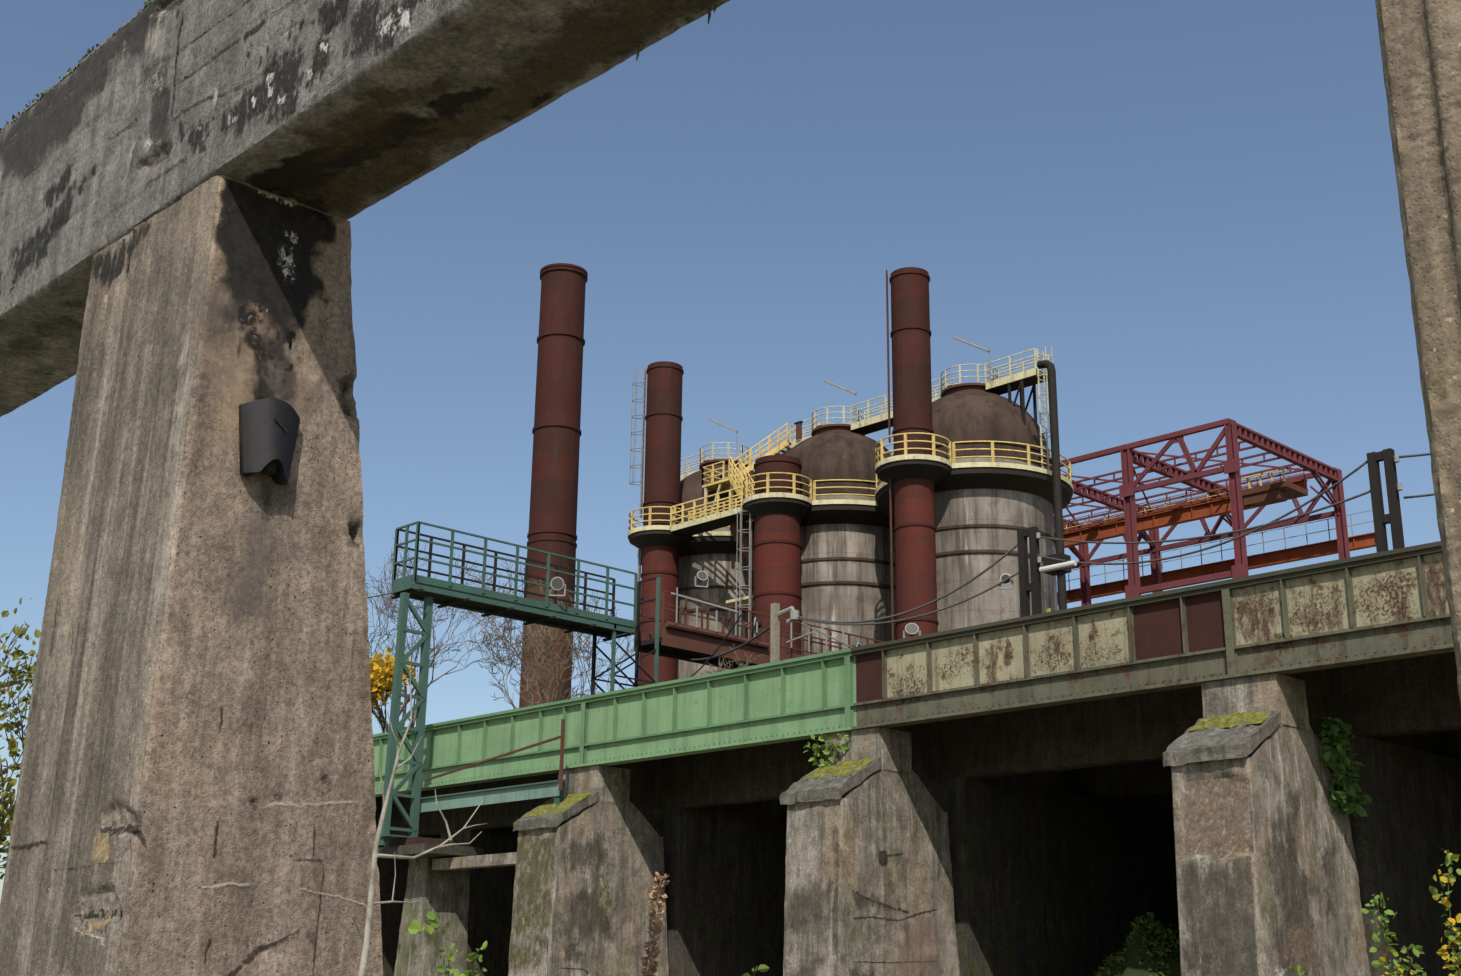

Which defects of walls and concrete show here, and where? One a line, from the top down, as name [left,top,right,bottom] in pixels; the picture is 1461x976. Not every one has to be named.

leakage [0,0,183,179]
leakage [280,231,297,280]
leakage [238,310,287,400]
rust [937,639,1013,693]
rust [1034,619,1114,676]
rust [1233,560,1447,655]
spalling [74,886,122,943]
crack [204,819,324,976]
leakage [785,827,880,976]